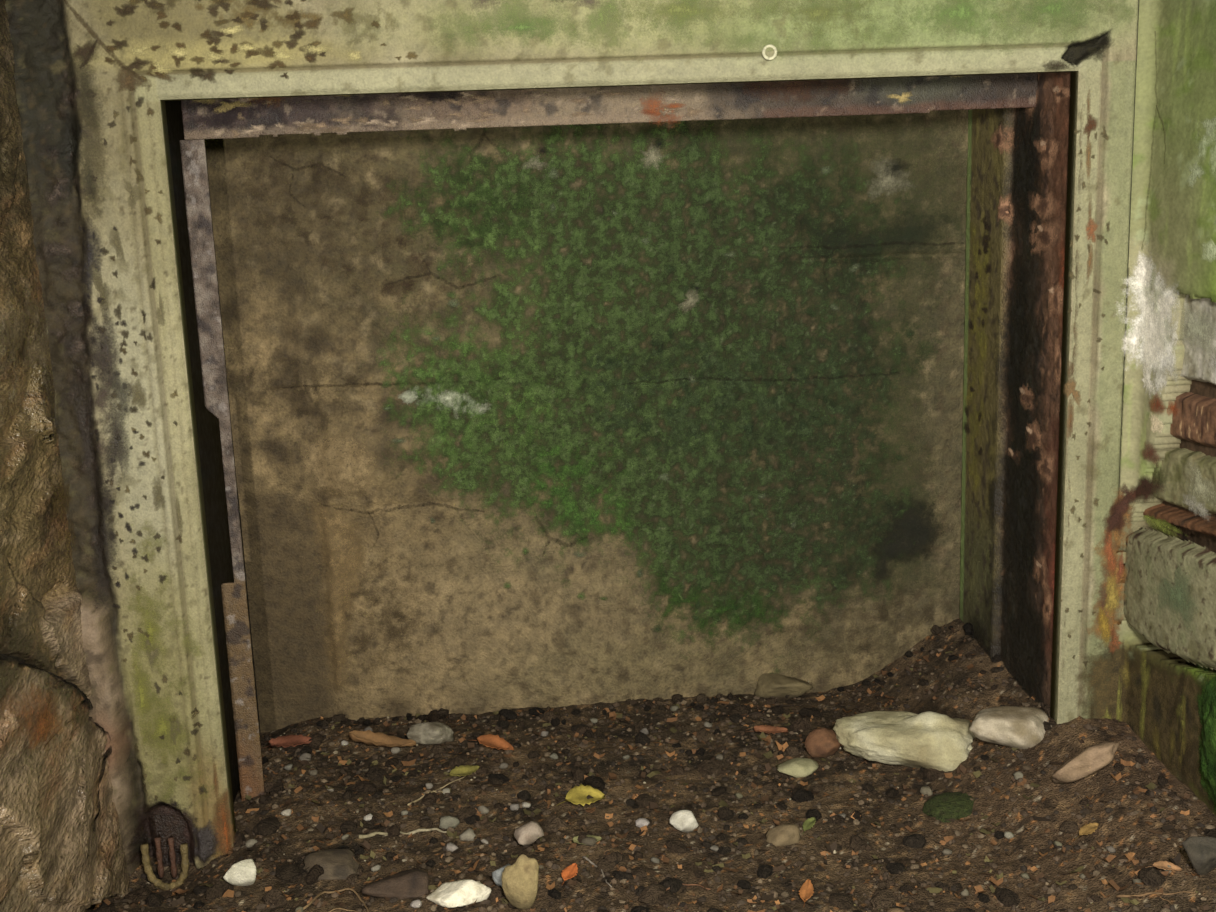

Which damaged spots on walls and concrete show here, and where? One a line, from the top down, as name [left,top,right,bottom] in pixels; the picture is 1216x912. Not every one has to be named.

peeling [104,0,393,145]
peeling [198,95,435,137]
corrosion [1052,77,1096,349]
leakage [1189,119,1216,184]
peeling [93,230,164,355]
leakage [1124,257,1178,393]
peeling [111,369,156,462]
leakage [401,392,486,412]
corrosion [1044,365,1080,614]
corrosion [1142,395,1165,464]
spalling [1120,295,1216,670]
corrosion [1095,477,1164,652]